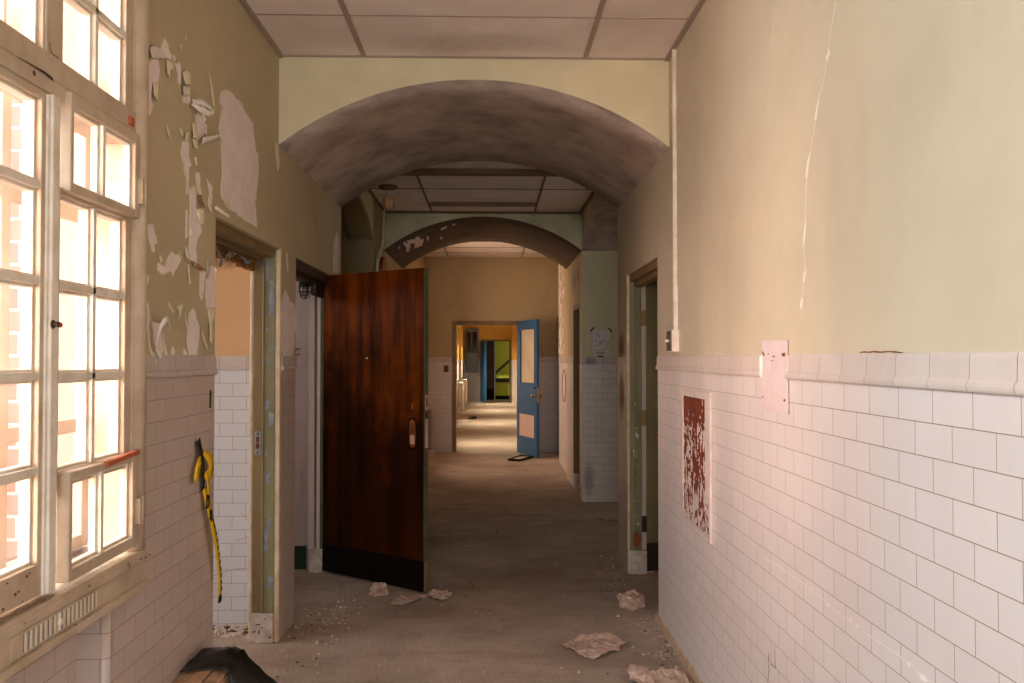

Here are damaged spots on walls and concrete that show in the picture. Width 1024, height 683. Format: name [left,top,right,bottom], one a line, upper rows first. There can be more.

peeling [146,36,297,366]
peeling [398,224,455,252]
crack [800,3,836,321]